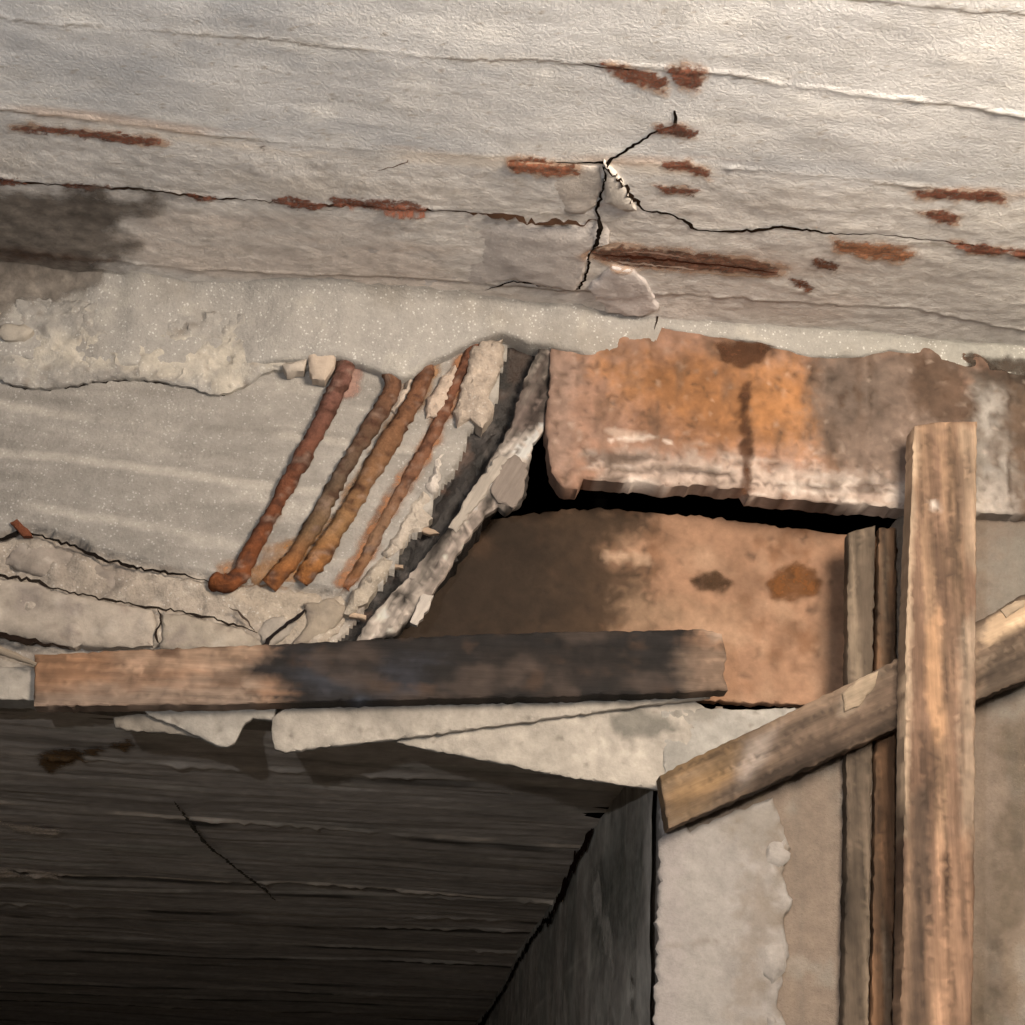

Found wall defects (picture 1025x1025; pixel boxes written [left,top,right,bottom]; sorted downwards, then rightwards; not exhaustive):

rust [601,62,705,94]
damp [0,185,162,318]
crack [1,179,277,203]
crack [312,110,1016,290]
rust [581,243,814,293]
rust [913,187,1006,226]
peeling [0,297,336,397]
spalling [425,339,505,437]
rust [208,344,479,593]
spalling [491,435,897,537]
spalling [0,449,447,651]
crack [478,828,594,1025]